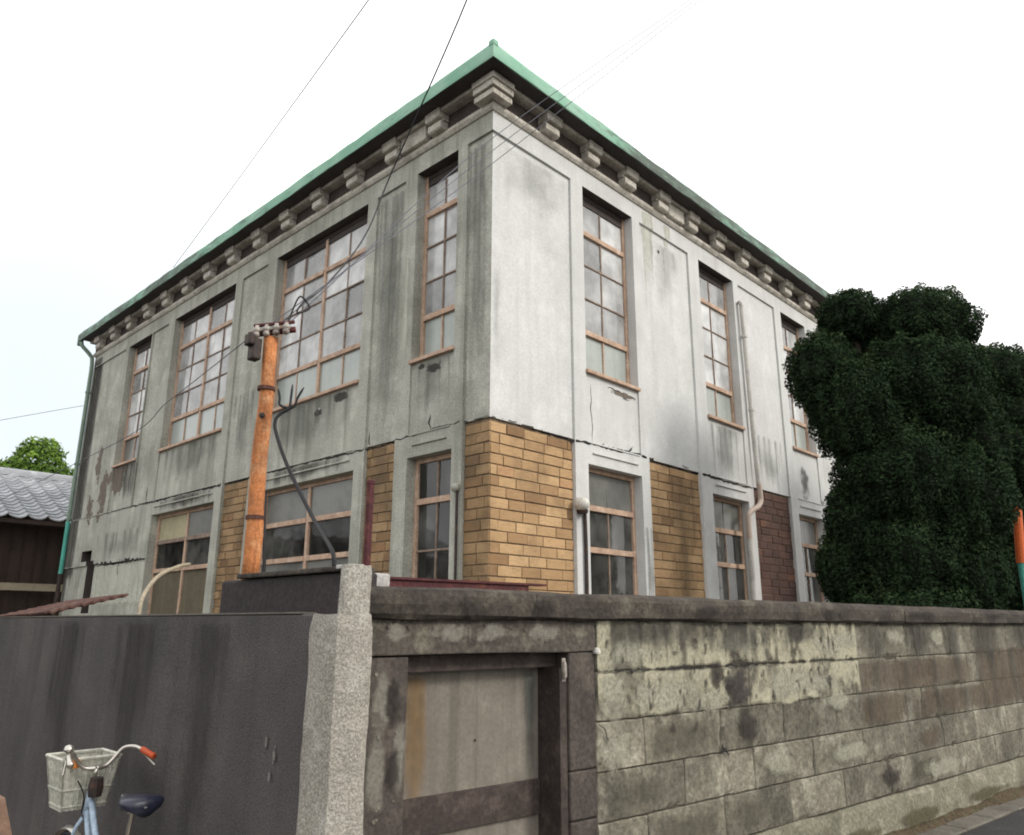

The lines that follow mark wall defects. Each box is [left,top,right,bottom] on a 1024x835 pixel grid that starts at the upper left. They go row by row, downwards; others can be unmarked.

peeling [85,443,127,526]
crack [83,387,788,519]
damp [387,681,399,721]
damp [597,610,1024,752]
damp [386,751,398,784]